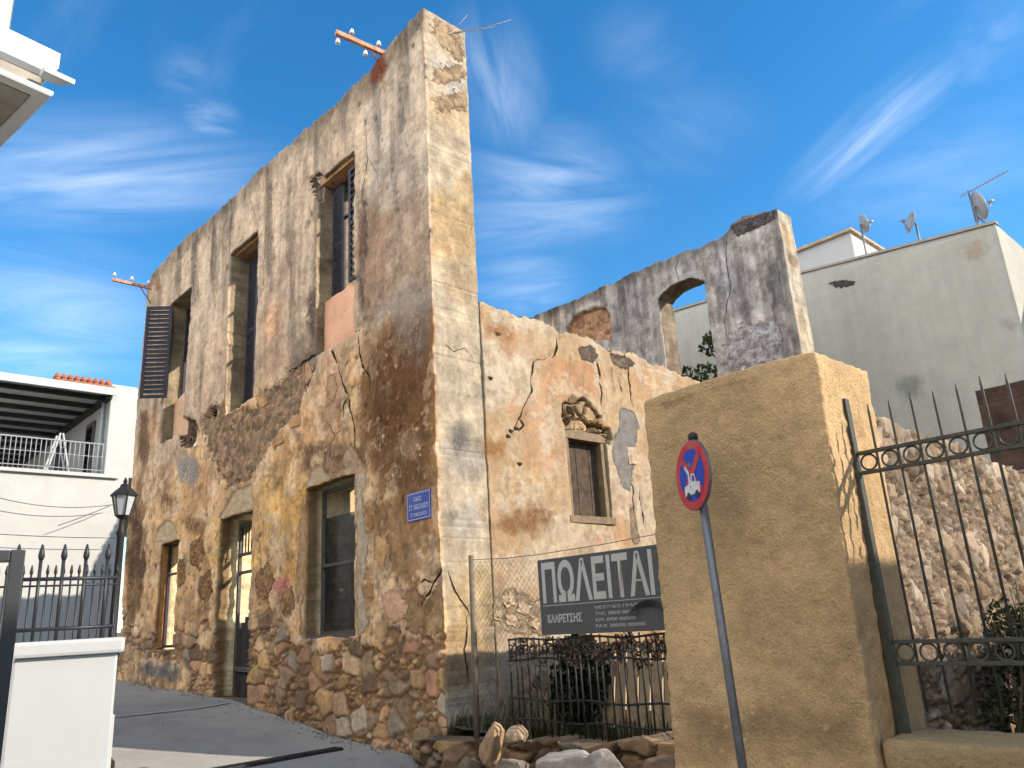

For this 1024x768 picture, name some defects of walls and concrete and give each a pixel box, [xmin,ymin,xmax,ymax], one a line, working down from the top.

corrosion [371,54,387,81]
spalling [429,17,468,114]
crack [723,234,731,336]
spalling [828,280,856,289]
spalling [567,307,635,369]
crack [287,330,371,457]
crack [511,339,558,436]
spalling [561,402,640,492]
leakage [126,505,146,624]
crack [420,568,470,685]
spalling [489,587,551,638]